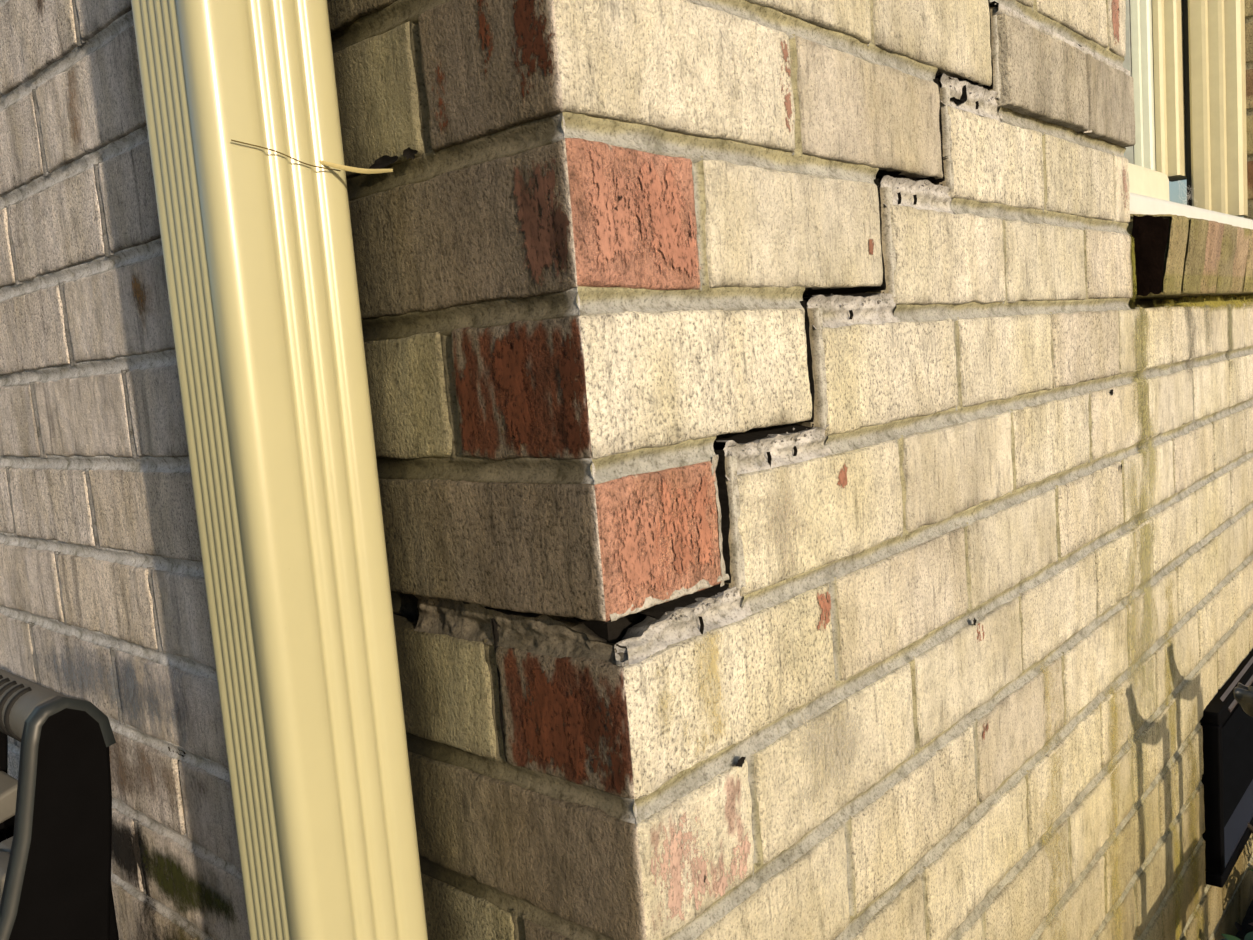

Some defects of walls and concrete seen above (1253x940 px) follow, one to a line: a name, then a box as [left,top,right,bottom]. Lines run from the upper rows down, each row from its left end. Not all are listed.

leakage [112,820,169,940]
crack [484,606,543,762]
crack [574,0,999,643]
leakage [1109,237,1204,940]